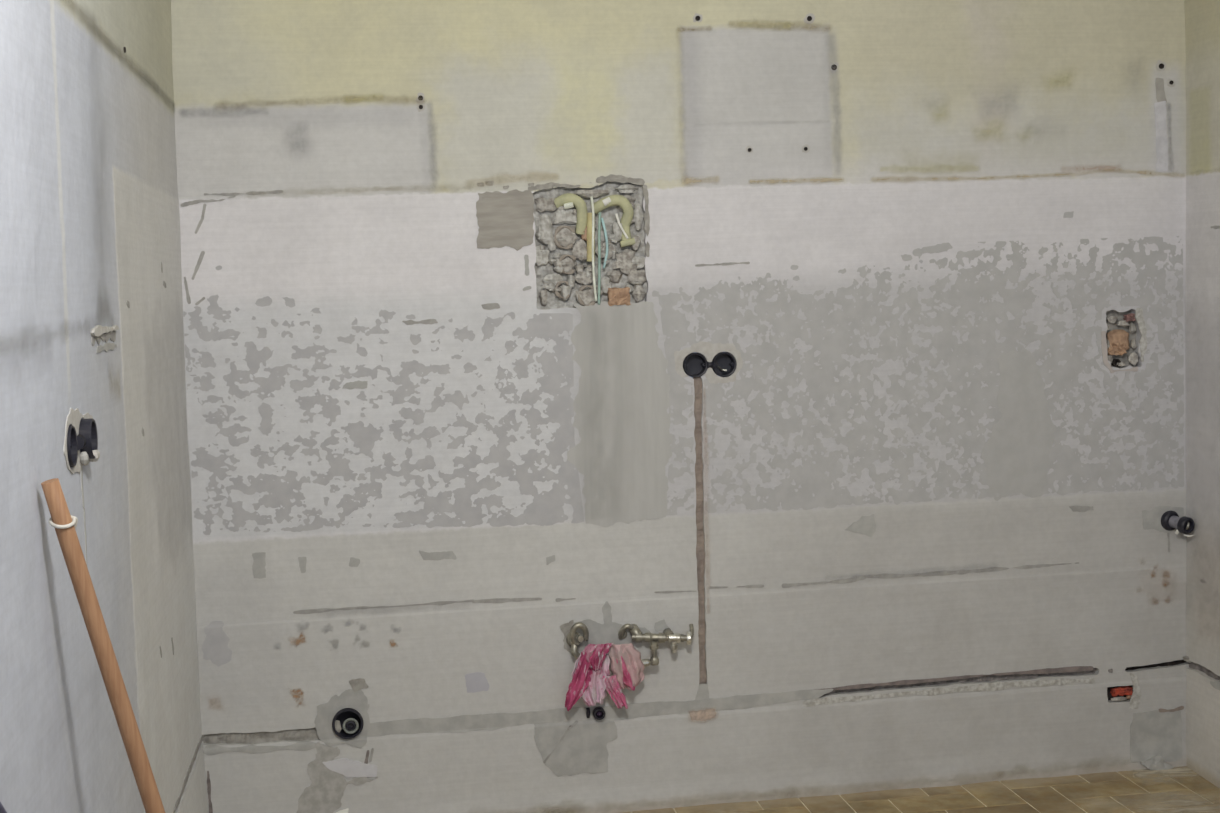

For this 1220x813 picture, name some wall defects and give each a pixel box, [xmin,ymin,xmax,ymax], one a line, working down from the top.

peeling [183,174,1184,537]
spalling [297,678,378,813]